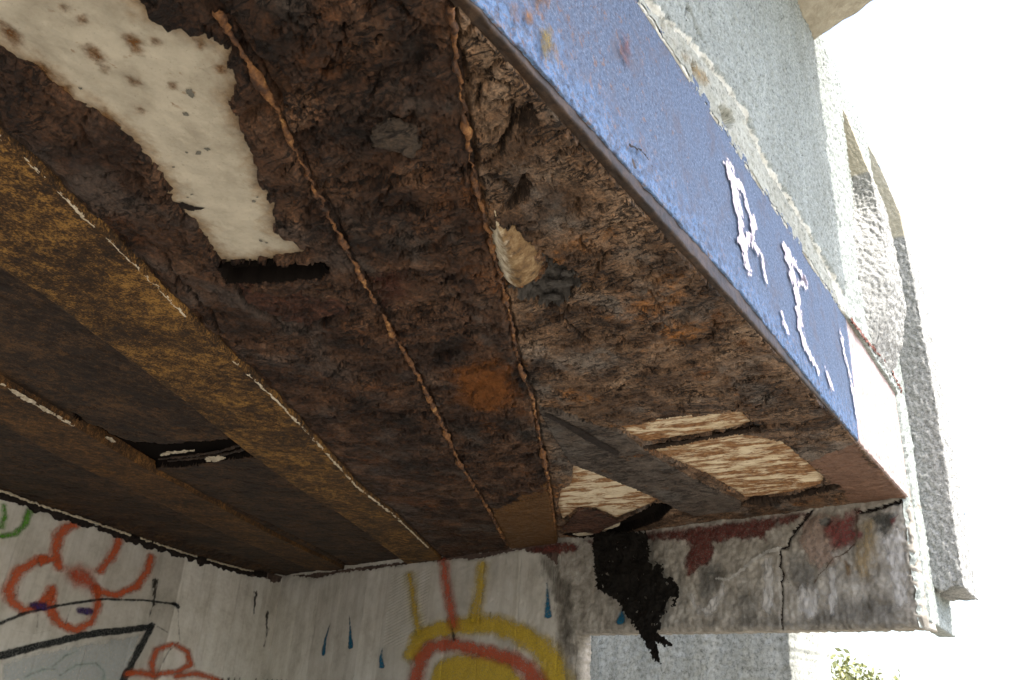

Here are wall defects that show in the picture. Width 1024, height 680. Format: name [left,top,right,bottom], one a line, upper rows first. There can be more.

spalling [0,0,330,284]
crack [477,77,529,146]
peeling [106,238,187,317]
corrosion [212,10,508,546]
corrosion [446,5,679,664]
peeling [0,383,253,468]
peeling [232,361,429,548]
spalling [622,412,840,505]
crack [814,507,859,583]